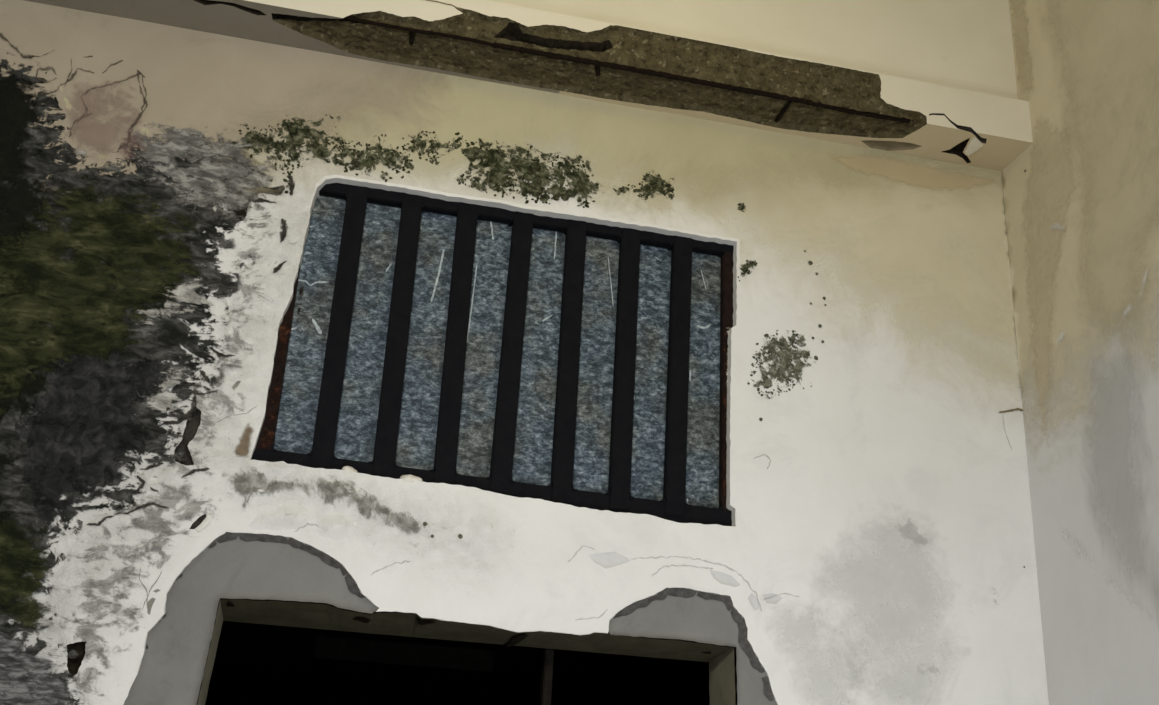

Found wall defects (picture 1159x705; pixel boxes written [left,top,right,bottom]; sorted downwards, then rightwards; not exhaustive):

crack [194,0,266,15]
crack [0,33,148,152]
spalling [272,6,927,151]
crack [929,113,987,163]
water stain [252,0,1159,416]
water stain [0,59,281,668]
rust [261,287,303,450]
flaking render [189,514,213,533]
water stain [45,666,99,705]
spalling [137,532,368,673]
spalling [505,635,528,647]
spalling [614,570,783,704]